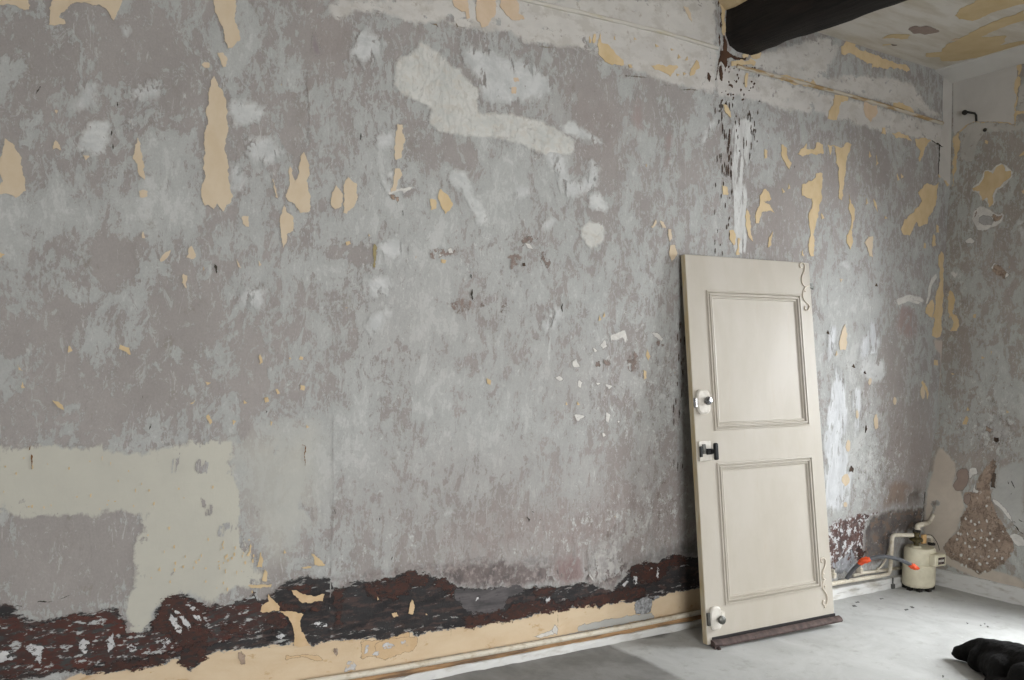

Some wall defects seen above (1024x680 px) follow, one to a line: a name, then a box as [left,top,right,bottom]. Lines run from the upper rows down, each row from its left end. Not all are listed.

peeling [49,0,122,26]
peeling [925,0,1024,61]
peeling [201,0,240,211]
peeling [0,139,26,198]
peeling [272,152,311,248]
peeling [327,0,961,338]
peeling [965,163,1024,244]
water stain [860,318,881,363]
water stain [823,323,878,570]
spalling [943,459,1024,575]
water stain [329,526,698,590]